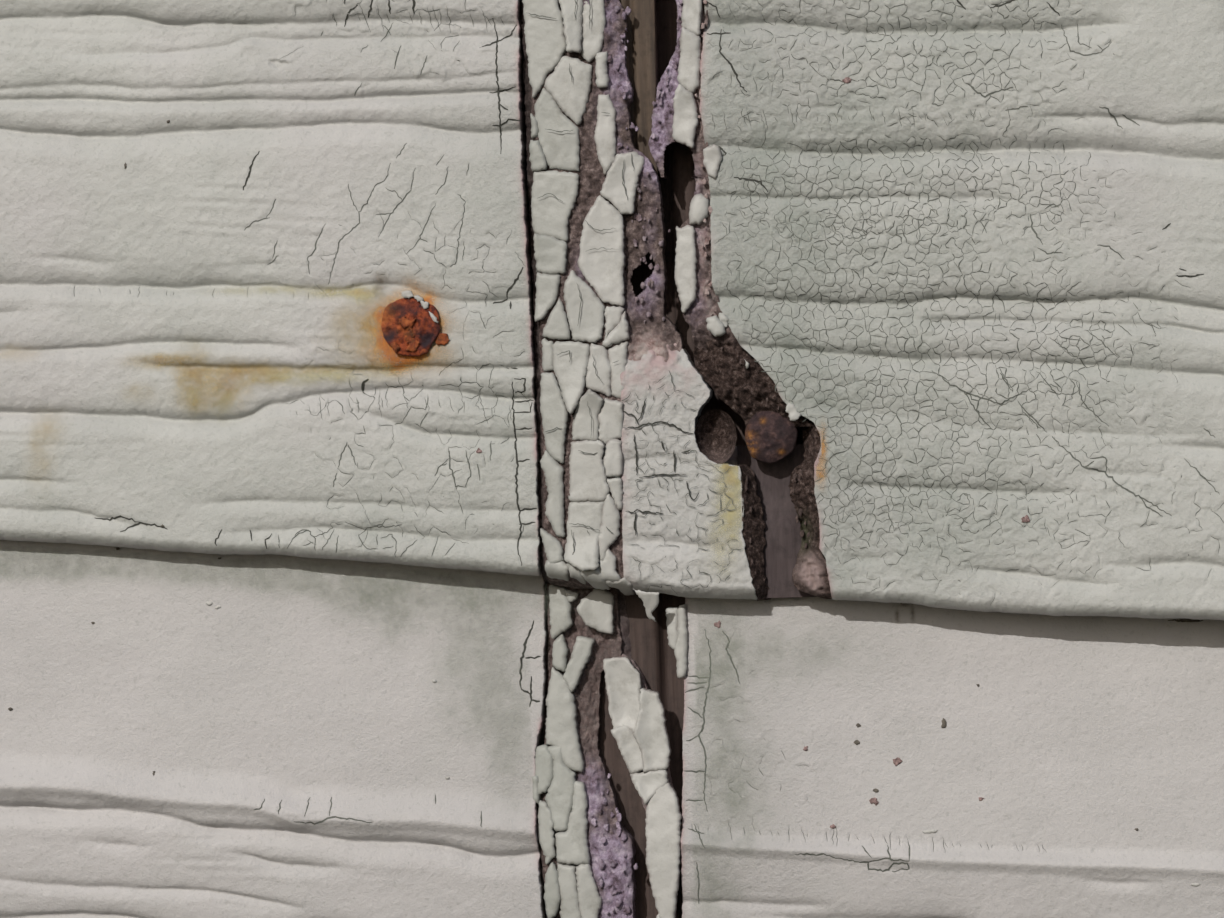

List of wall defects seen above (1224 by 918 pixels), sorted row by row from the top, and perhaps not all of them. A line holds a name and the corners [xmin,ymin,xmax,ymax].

crack [278,0,591,154]
peeling [672,0,722,179]
crack [96,515,167,532]
corrosion [325,288,430,372]
crack [215,143,741,592]
peeling [522,0,688,918]
peeling [674,193,709,313]
spalling [693,311,832,601]